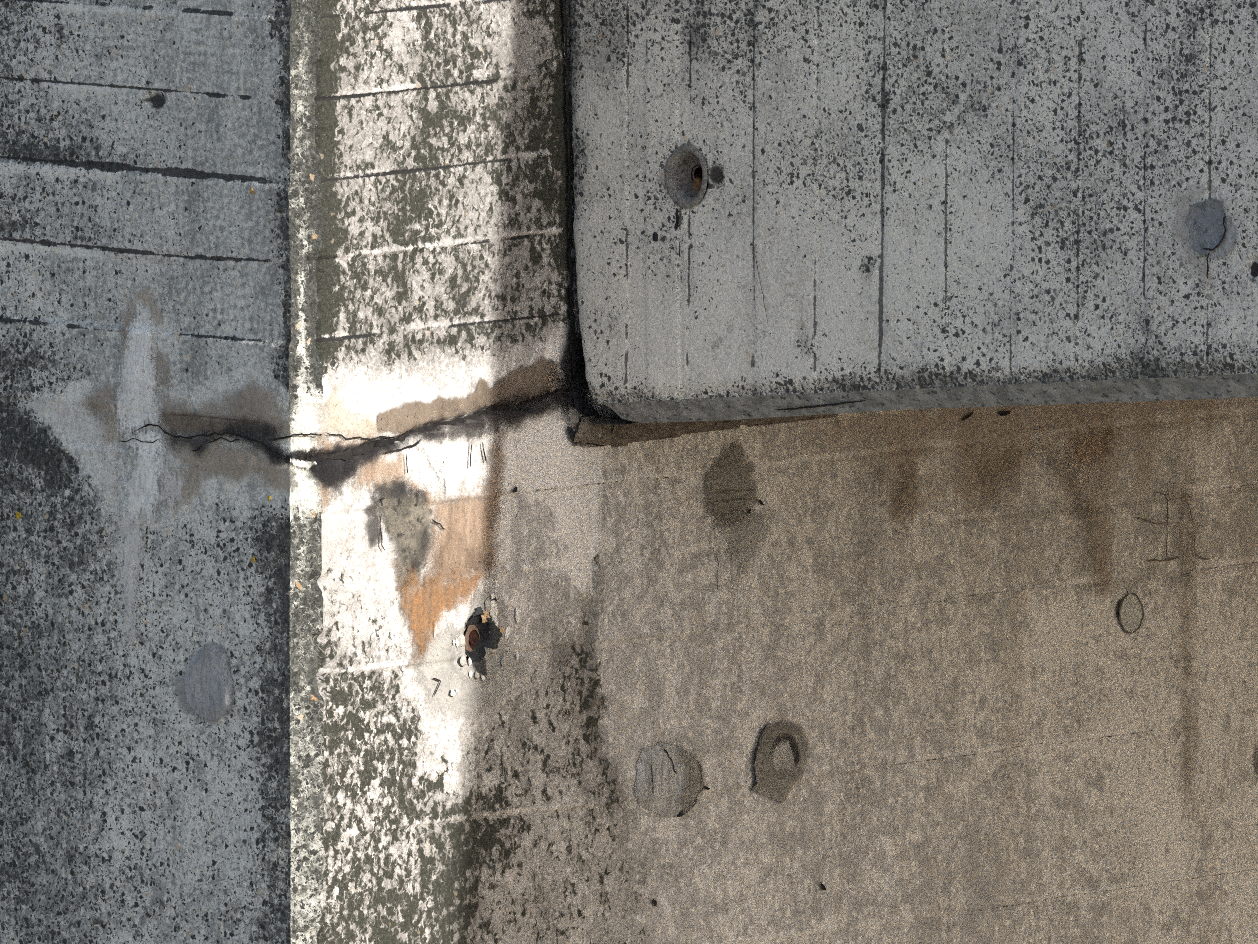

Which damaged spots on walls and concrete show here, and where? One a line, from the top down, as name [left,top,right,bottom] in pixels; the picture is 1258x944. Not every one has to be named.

corrosion [691,165,703,191]
water stain [27,288,589,639]
crack [119,392,566,473]
corrosion [355,434,503,661]